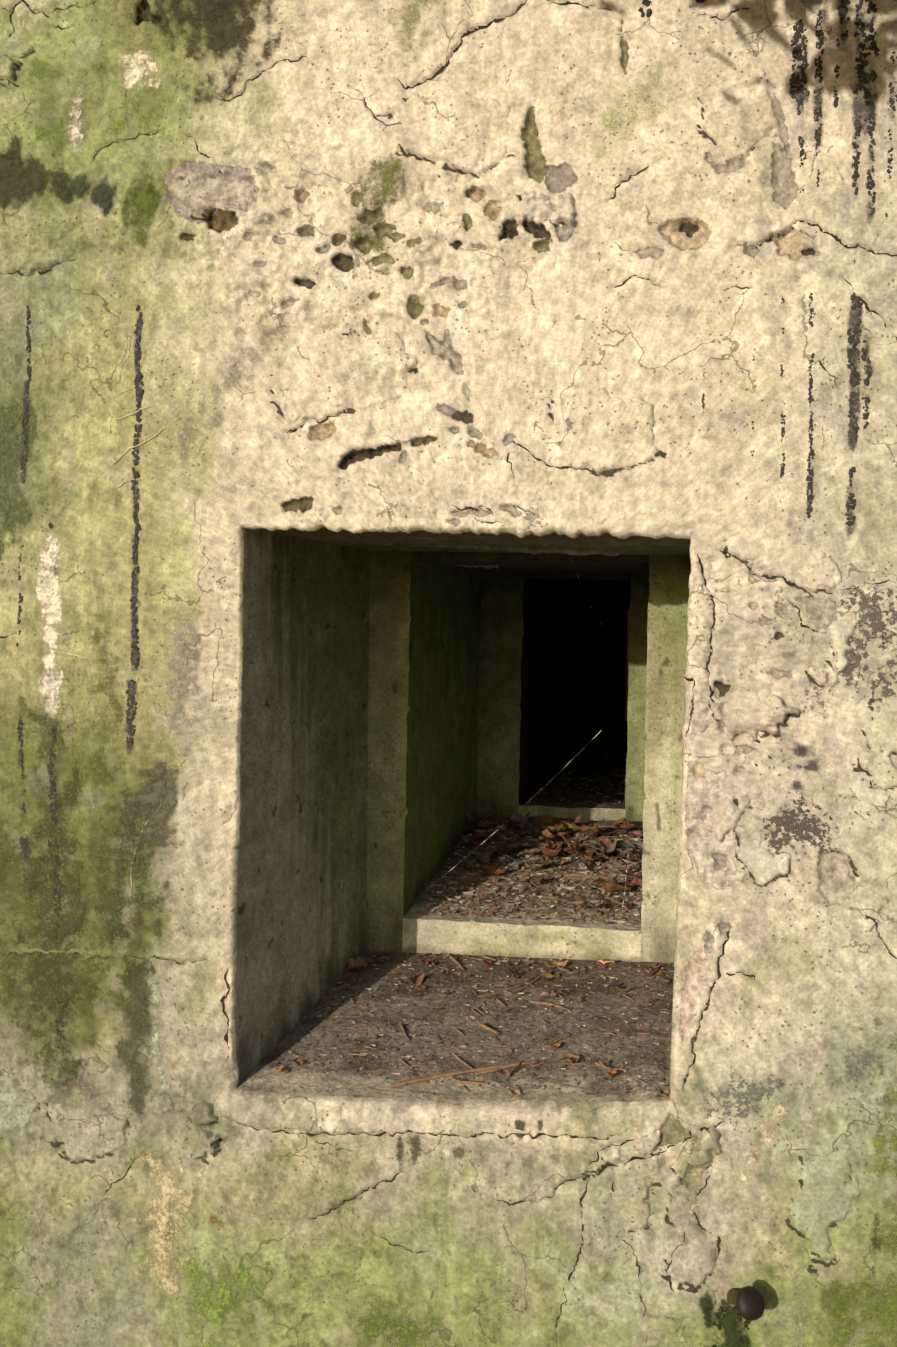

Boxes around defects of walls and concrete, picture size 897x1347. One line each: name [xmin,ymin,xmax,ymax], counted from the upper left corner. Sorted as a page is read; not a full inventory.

peeling [163,161,276,241]
spalling [265,189,422,279]
peeling [388,91,578,253]
crack [719,169,897,340]
water stain [789,0,897,223]
peeling [270,276,517,470]
water stain [847,293,874,451]
water stain [87,305,144,755]
crack [745,547,896,633]
spalling [683,529,857,890]
water stain [14,522,189,1132]
crack [0,922,768,1347]